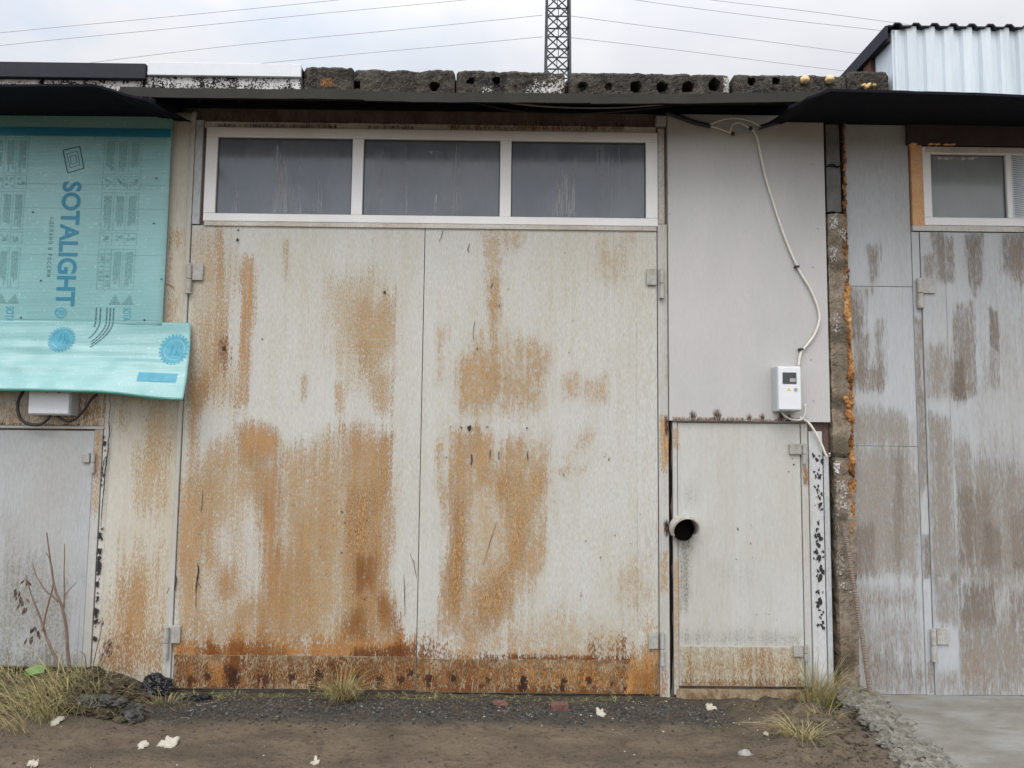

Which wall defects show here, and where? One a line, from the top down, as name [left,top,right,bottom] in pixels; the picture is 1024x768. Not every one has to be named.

peeling [832,246,883,391]
peeling [925,232,954,281]
peeling [966,233,984,289]
rust [99,230,805,697]
peeling [812,303,1024,695]